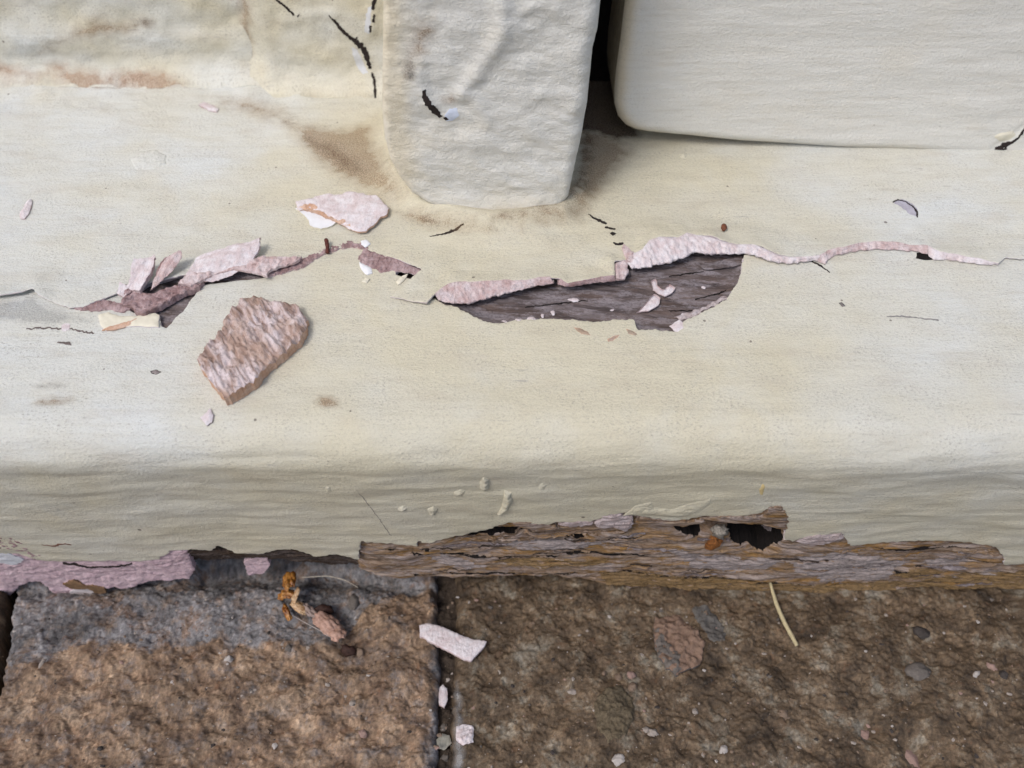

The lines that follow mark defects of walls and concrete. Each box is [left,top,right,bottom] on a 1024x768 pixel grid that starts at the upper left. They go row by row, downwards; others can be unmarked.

crack [329,0,377,98]
peeling [26,238,421,345]
peeling [433,233,999,332]